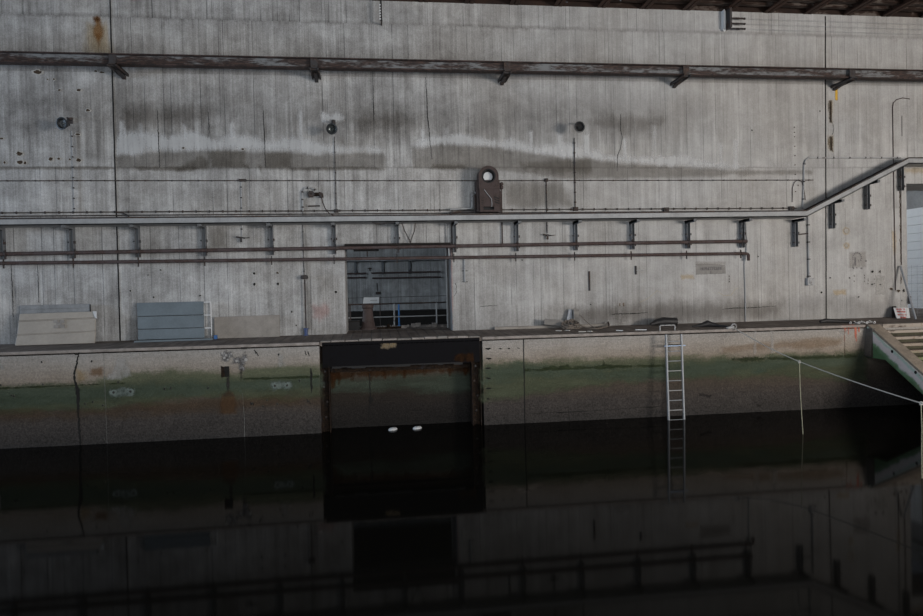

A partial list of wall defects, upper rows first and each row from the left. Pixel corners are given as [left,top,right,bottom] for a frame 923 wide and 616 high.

rust [93,16,103,41]
crack [73,353,82,445]